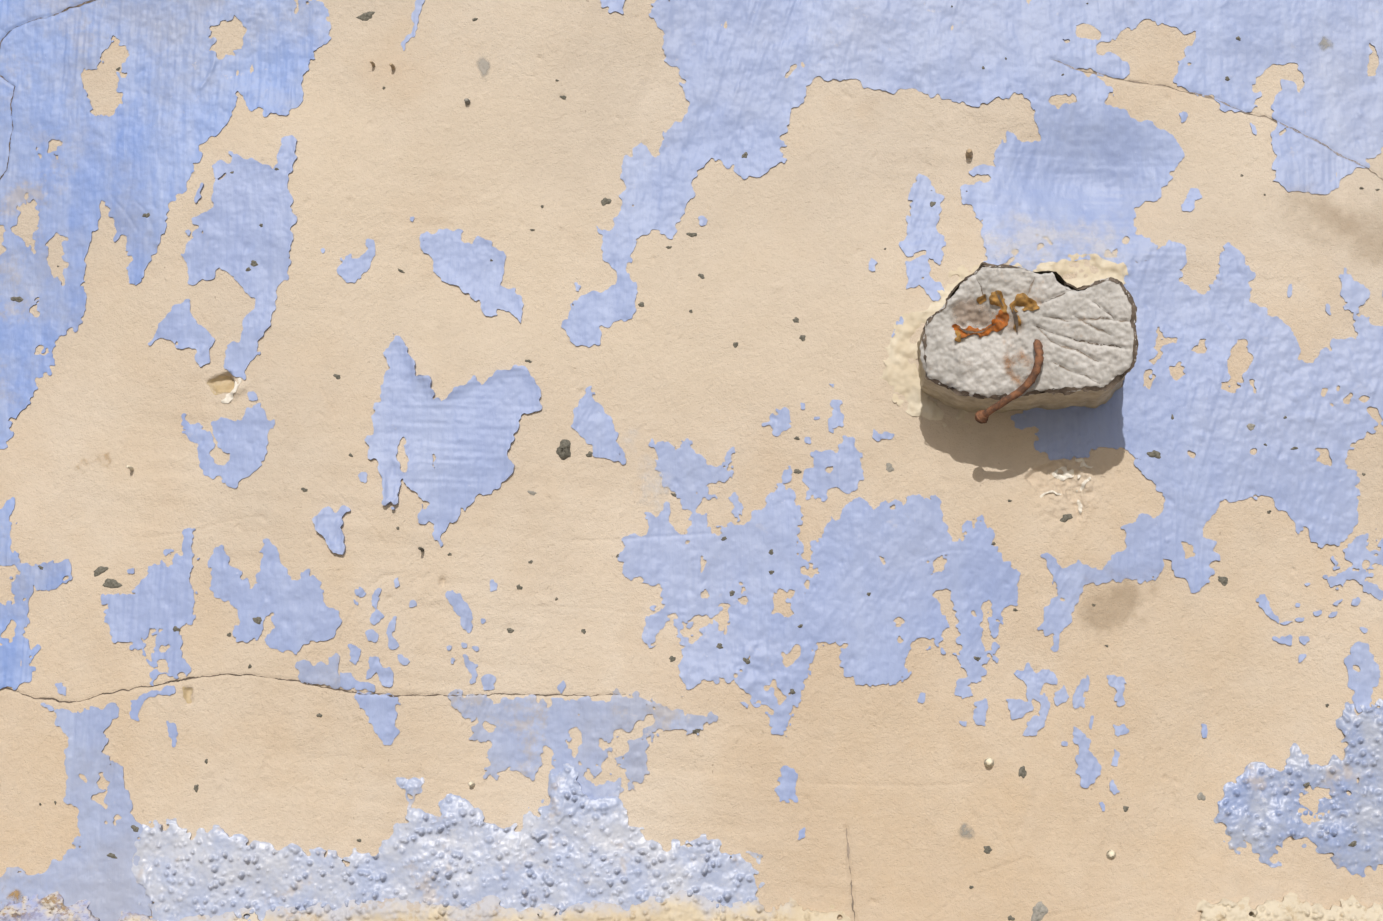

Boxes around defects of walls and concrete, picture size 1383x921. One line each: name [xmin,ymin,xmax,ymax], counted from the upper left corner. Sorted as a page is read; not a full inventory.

crack [0,0,95,179]
crack [1054,60,1383,181]
peeling [0,0,331,489]
peeling [410,217,524,323]
peeling [561,0,1383,663]
rust [952,290,1040,342]
peeling [358,333,542,547]
peeling [0,497,73,690]
peeling [0,528,417,921]
crack [0,674,623,703]
peeling [445,384,1021,803]
peeling [1006,662,1129,811]